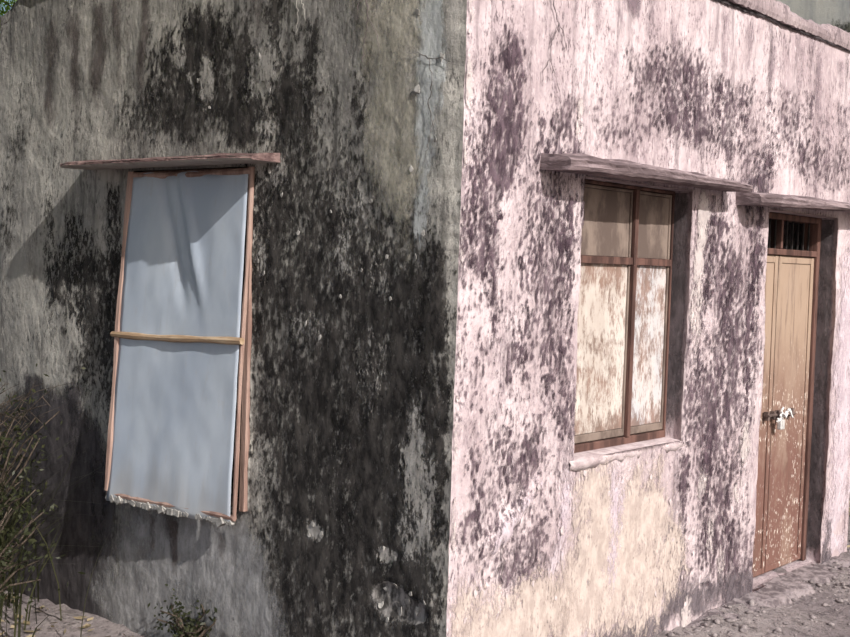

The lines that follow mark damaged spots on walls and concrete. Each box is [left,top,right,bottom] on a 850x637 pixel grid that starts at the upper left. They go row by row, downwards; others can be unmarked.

crack [407,52,455,167]
crack [542,0,567,92]
water stain [594,36,850,194]
crack [717,0,850,52]
water stain [0,0,588,637]
water stain [599,192,767,637]